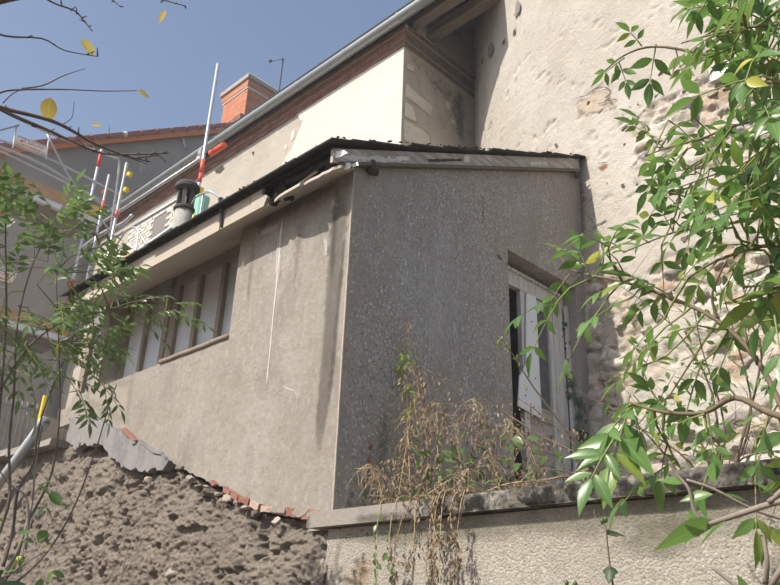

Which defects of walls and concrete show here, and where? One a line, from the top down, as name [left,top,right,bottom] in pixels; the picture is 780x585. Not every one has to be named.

flaking render [577,87,618,114]
peeling [120,428,138,445]
water stain [615,476,666,496]
water stain [676,472,705,489]
water stain [726,464,780,482]
water stain [433,482,581,515]